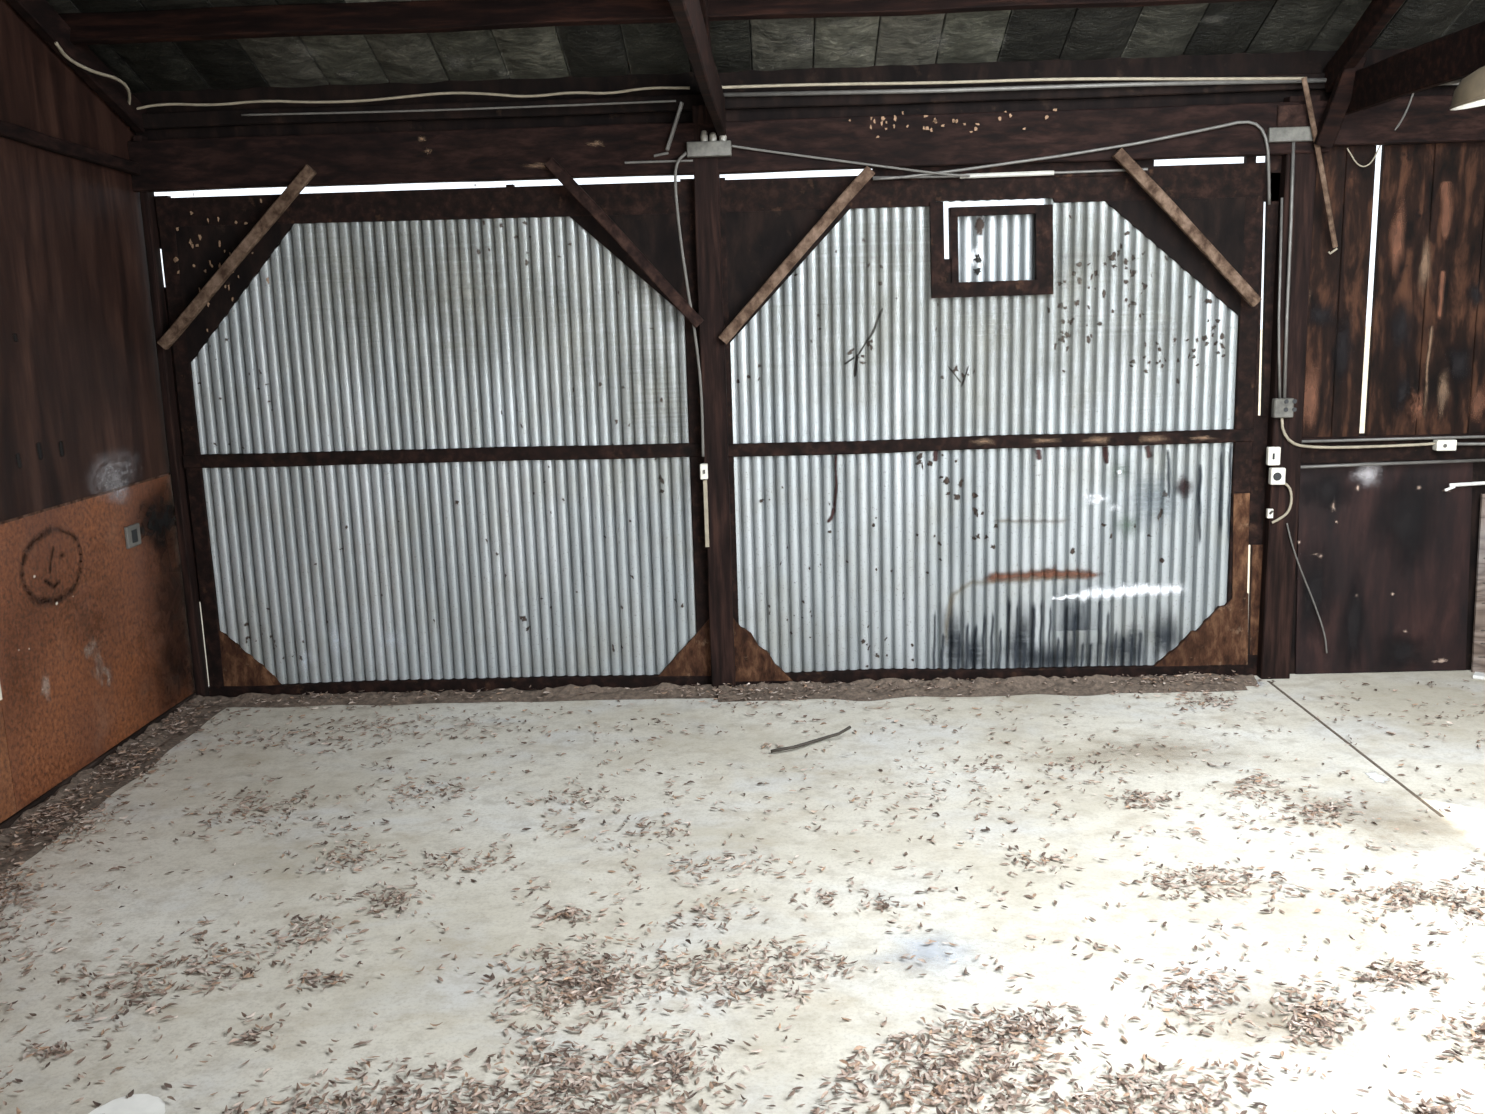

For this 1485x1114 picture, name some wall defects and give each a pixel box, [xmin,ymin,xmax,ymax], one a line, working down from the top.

corrosion [987,569,1097,581]
water stain [933,584,1183,669]